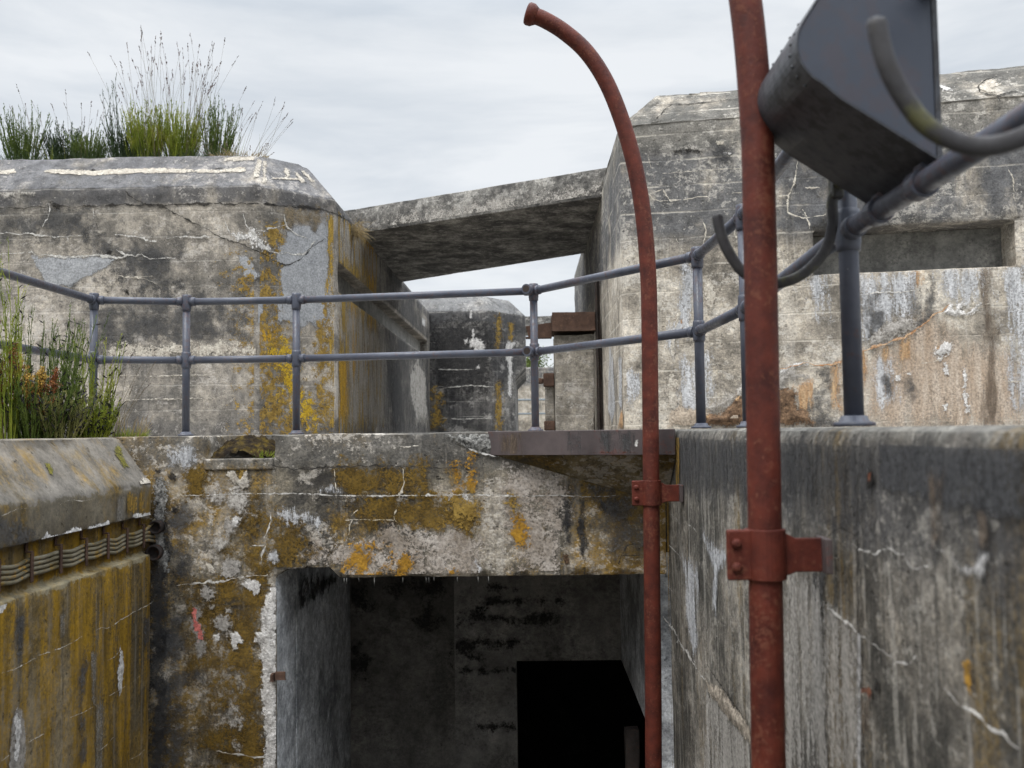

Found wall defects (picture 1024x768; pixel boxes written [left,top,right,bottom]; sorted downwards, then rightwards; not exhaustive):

crack [0,191,353,284]
crack [779,161,825,229]
damp [860,271,922,339]
damp [932,266,1024,424]
spalling [706,394,743,428]
spalling [779,369,816,427]
damp [144,445,210,768]
damp [683,559,699,652]
crack [661,581,745,720]
damp [784,572,861,768]
crack [827,493,946,667]
crack [943,687,1019,750]